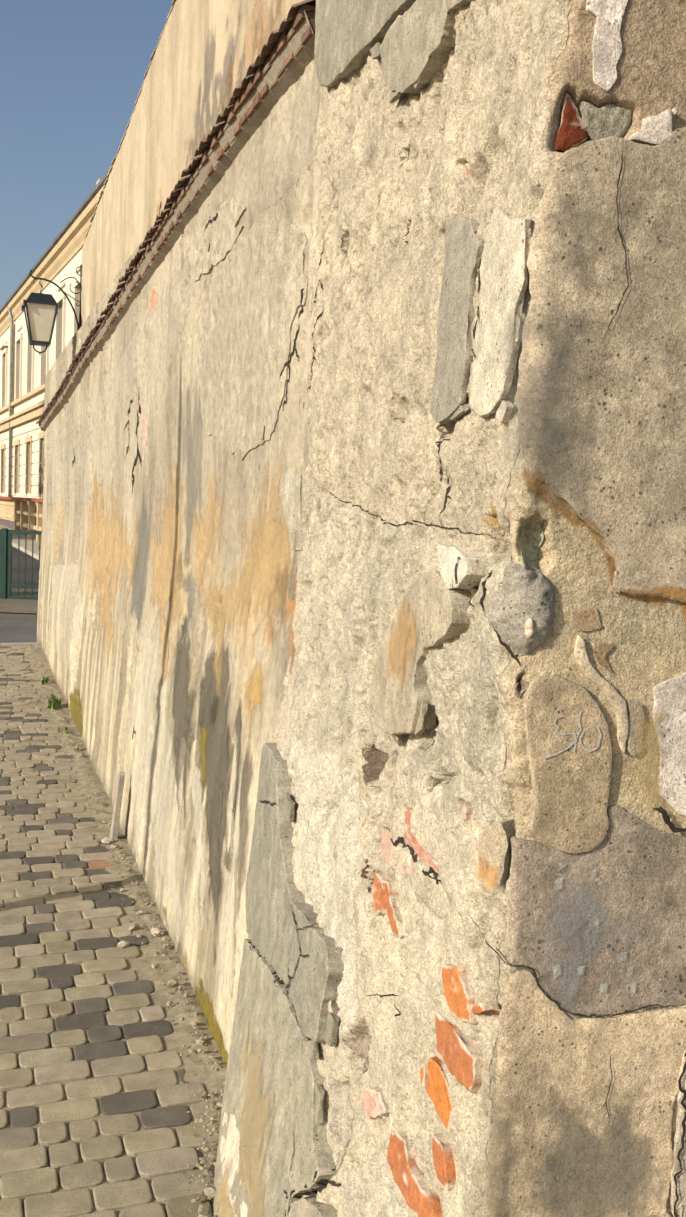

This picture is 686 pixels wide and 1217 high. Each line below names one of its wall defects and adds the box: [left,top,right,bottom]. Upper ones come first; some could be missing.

crack [204,213,218,231]
crack [279,245,324,411]
crack [599,152,633,345]
flaking render [47,0,686,885]
leakage [131,497,148,623]
crack [317,416,521,667]
leakage [172,393,251,985]
crack [248,907,317,1040]
flaking render [213,674,686,1217]
crack [283,1127,341,1217]